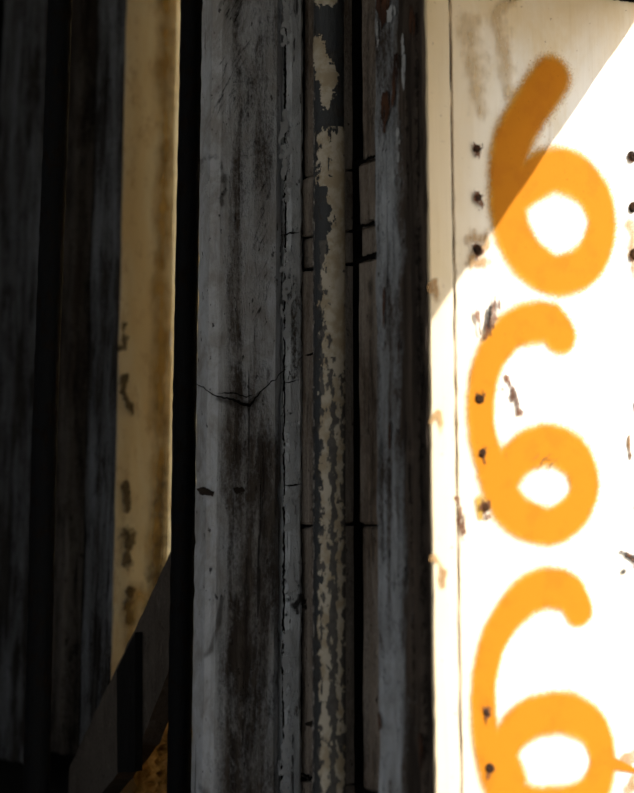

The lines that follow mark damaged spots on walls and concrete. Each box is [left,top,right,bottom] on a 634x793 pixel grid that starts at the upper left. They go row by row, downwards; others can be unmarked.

peeling [314,0,337,9]
crack [193,27,313,743]
peeling [312,34,346,793]
crack [280,763,313,791]